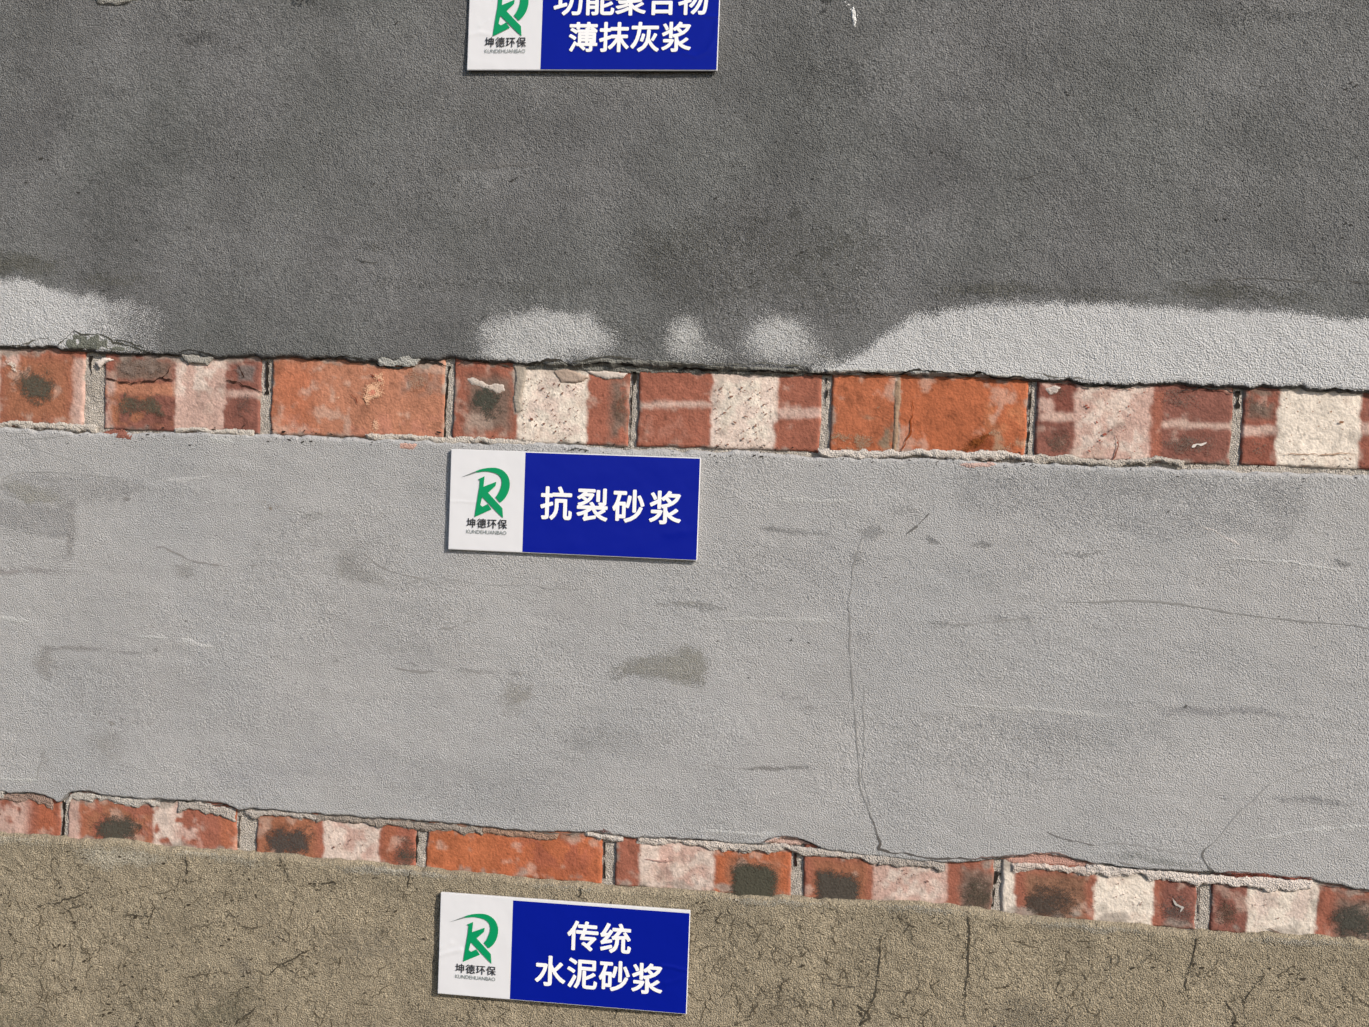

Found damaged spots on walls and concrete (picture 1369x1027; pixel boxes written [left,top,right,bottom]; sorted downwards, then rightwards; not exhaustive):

crack [0,857,458,1027]
crack [423,998,512,1027]
crack [562,902,1153,1027]
crack [1137,928,1369,1027]